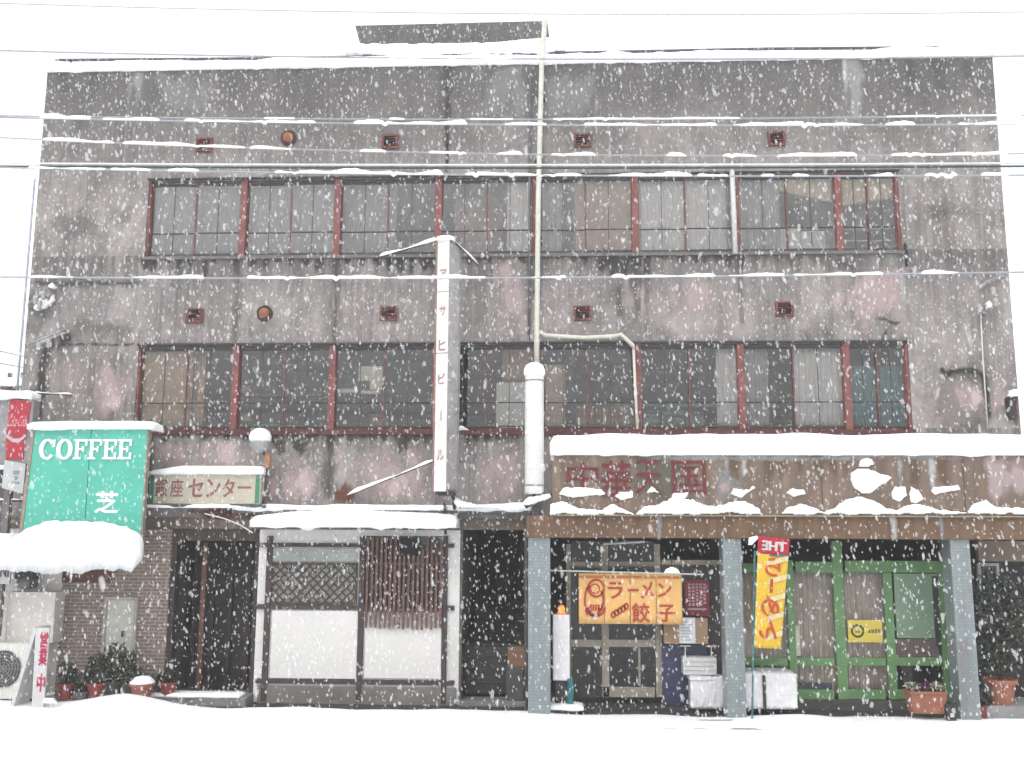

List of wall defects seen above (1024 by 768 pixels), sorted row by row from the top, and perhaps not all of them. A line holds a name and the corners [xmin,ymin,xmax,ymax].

water stain [842,59,865,120]